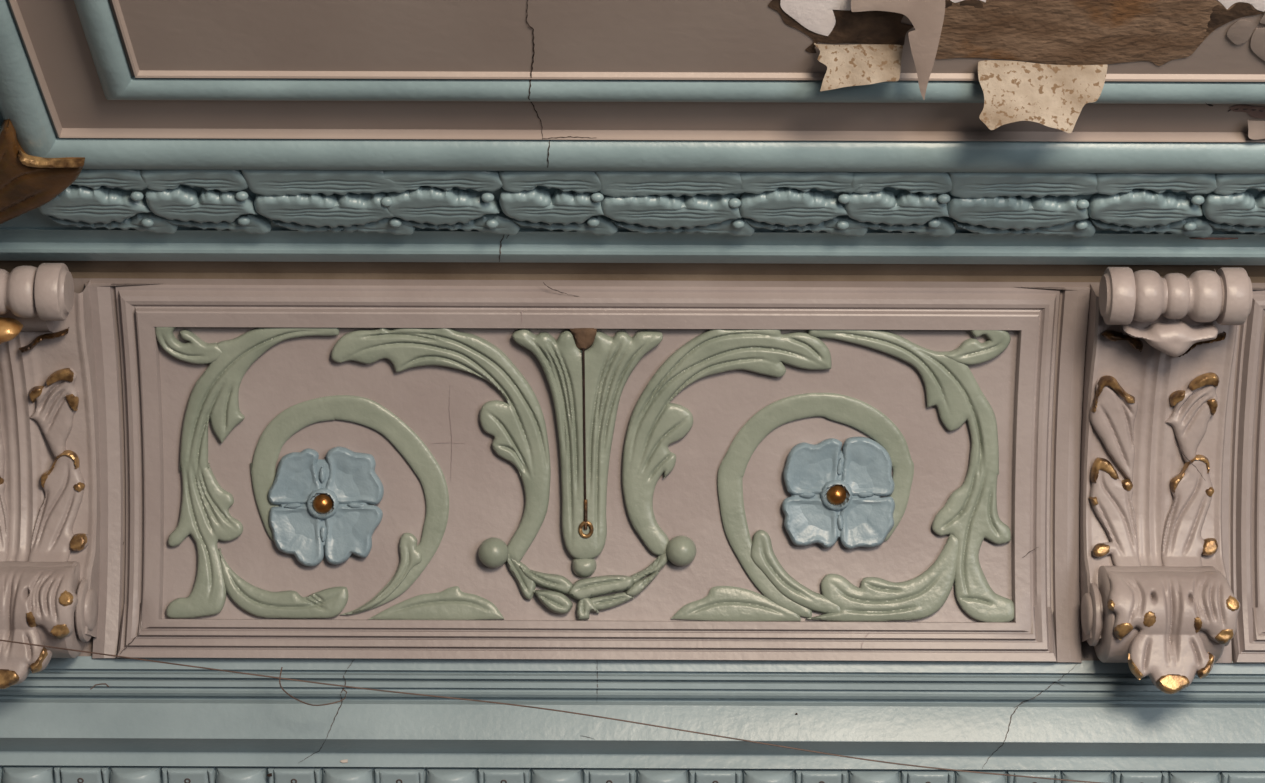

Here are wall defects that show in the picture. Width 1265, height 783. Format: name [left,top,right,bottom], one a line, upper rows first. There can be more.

crack [526,0,589,168]
spalling [768,0,1265,133]
peeling [1229,105,1265,140]
crack [304,659,355,760]
crack [982,663,1078,769]